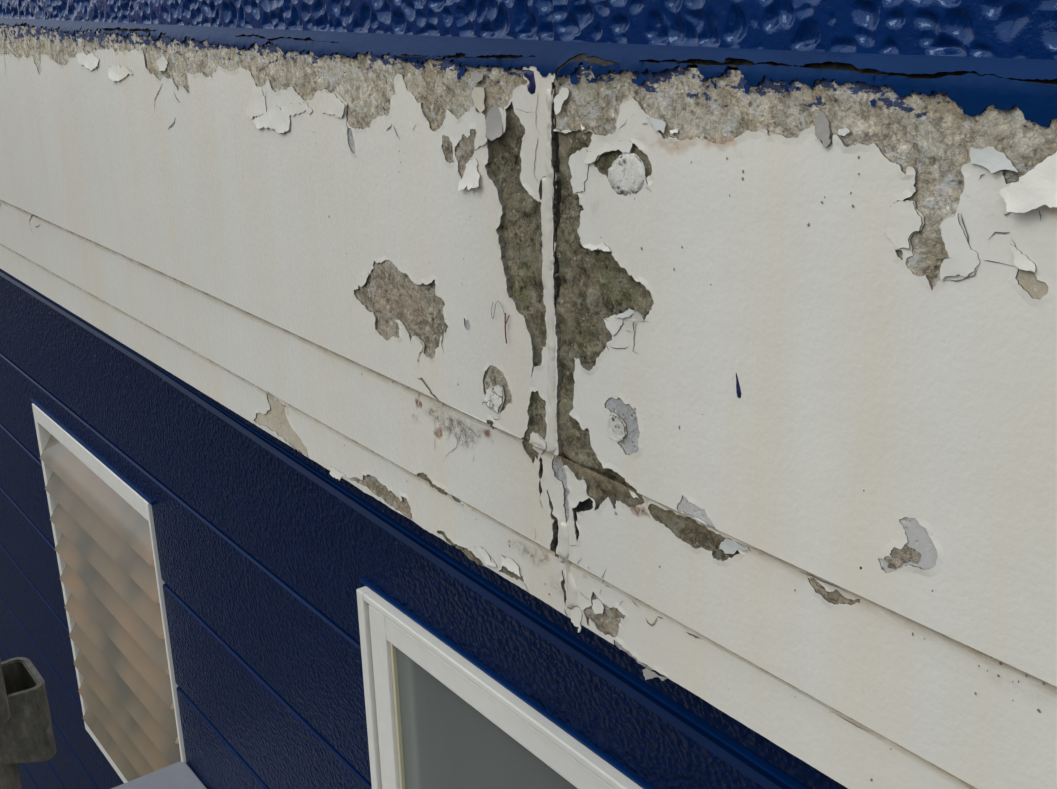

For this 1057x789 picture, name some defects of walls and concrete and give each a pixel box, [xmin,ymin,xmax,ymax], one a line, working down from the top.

peeling [0,25,1057,560]
peeling [879,517,938,573]
peeling [810,578,860,605]
peeling [566,593,667,681]